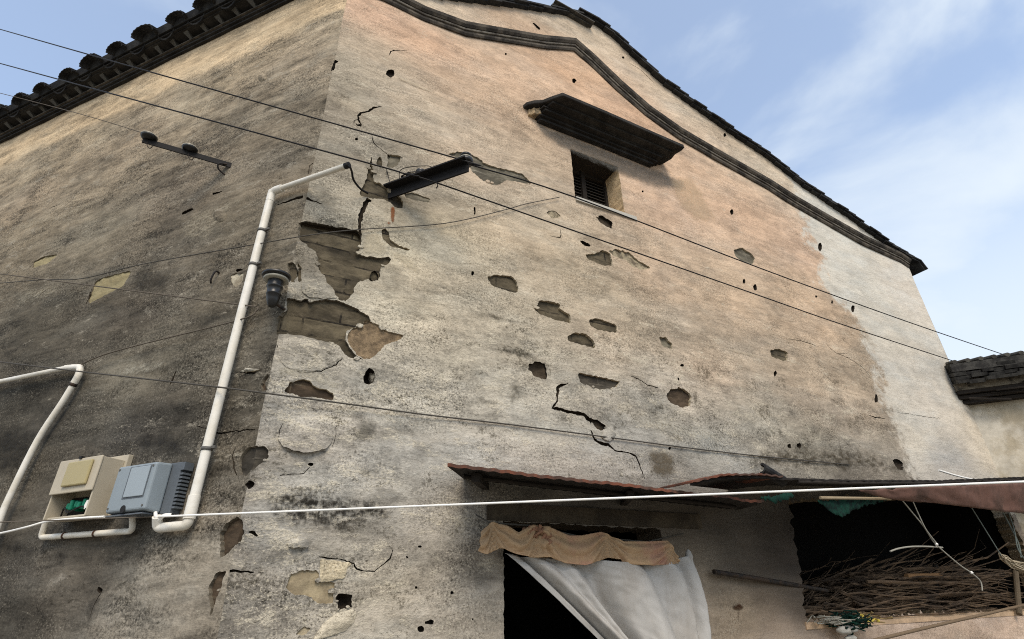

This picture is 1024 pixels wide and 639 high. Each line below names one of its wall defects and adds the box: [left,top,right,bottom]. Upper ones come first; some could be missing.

crack [354,106,390,163]
spalling [449,151,530,185]
crack [278,163,371,239]
spalling [274,221,413,360]
peeling [488,275,518,293]
peeling [534,300,617,348]
spalling [284,379,334,400]
peeling [578,373,620,390]
peeling [667,364,691,408]
crack [552,383,645,479]
peeling [219,517,244,558]
crack [319,550,393,572]